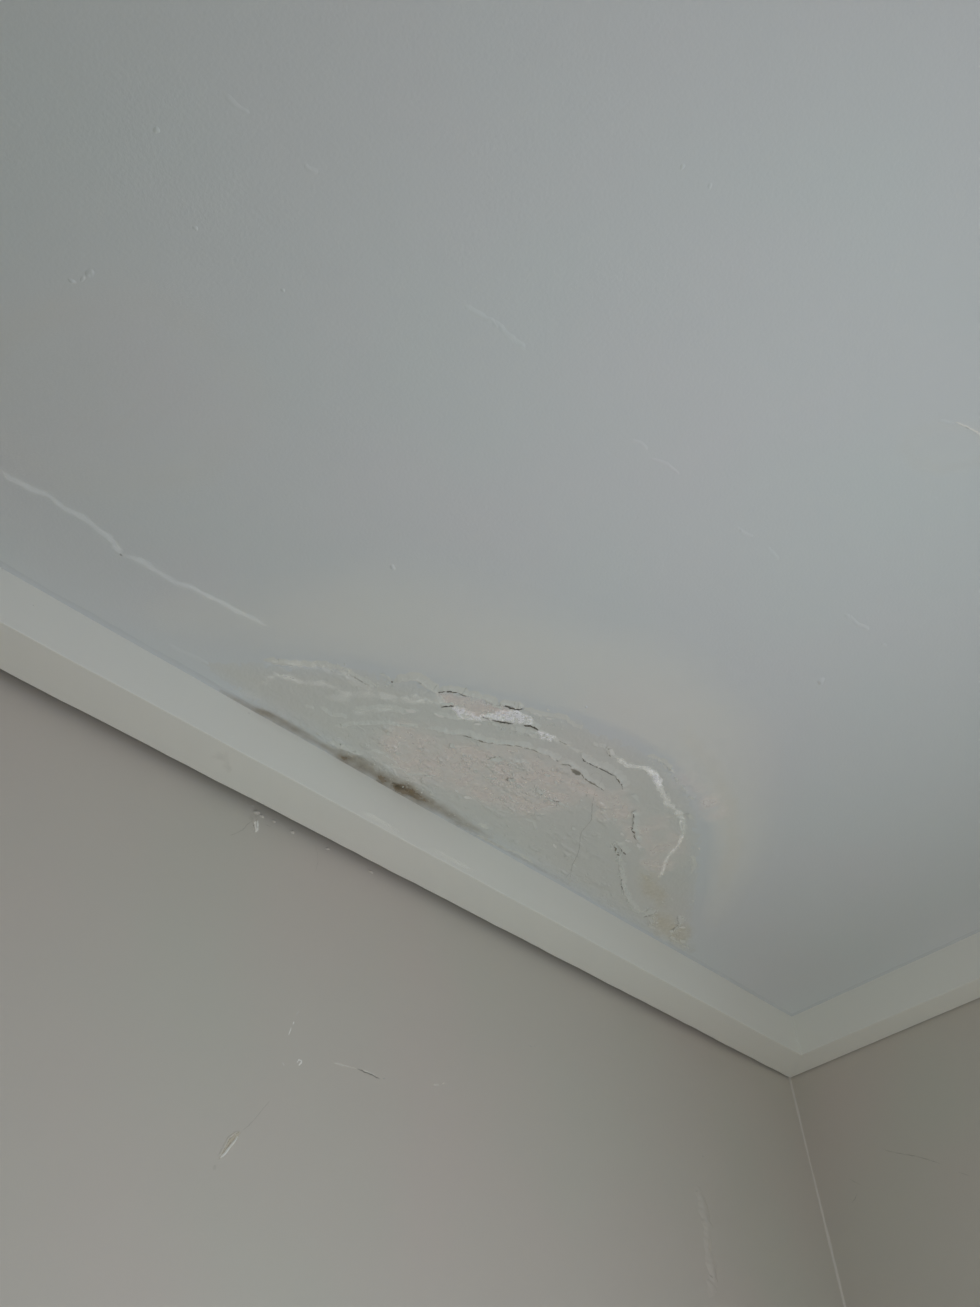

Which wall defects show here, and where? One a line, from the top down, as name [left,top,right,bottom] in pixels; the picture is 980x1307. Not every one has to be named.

peeling [204,657,703,951]